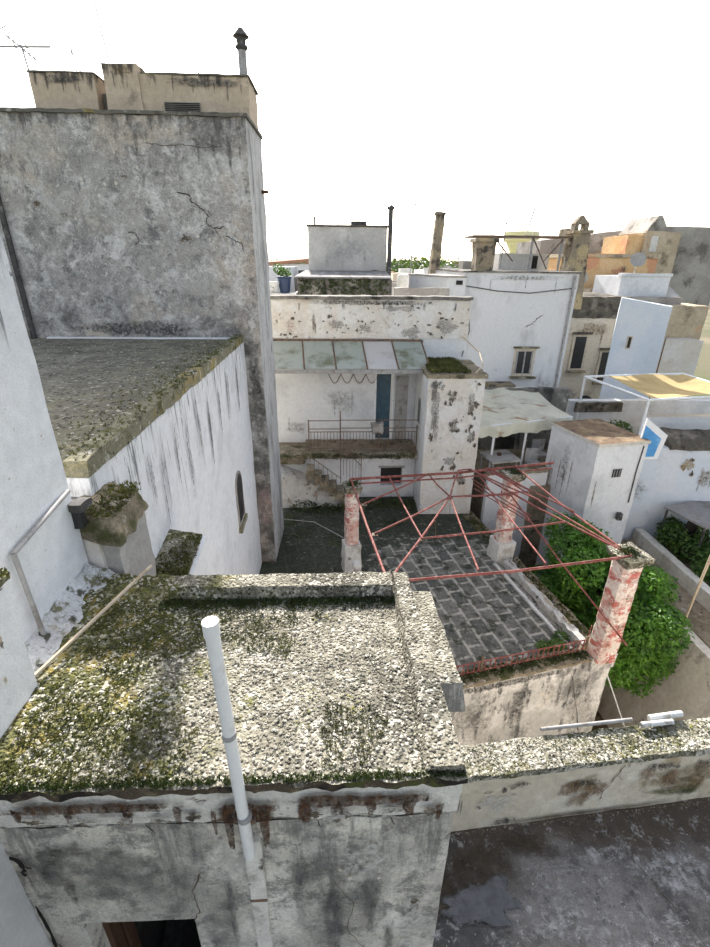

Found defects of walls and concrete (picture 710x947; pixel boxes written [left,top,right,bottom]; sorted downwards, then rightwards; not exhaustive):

damp [172,77,241,98]
crack [177,192,244,251]
peeling [322,314,375,333]
peeling [367,302,464,343]
flaking render [428,380,481,448]
peeling [440,452,465,485]
damp [560,777,606,805]
damp [641,760,710,795]
corrosion [2,803,181,830]
corrosion [211,804,237,849]
corrosion [248,794,444,847]
damp [439,838,553,914]